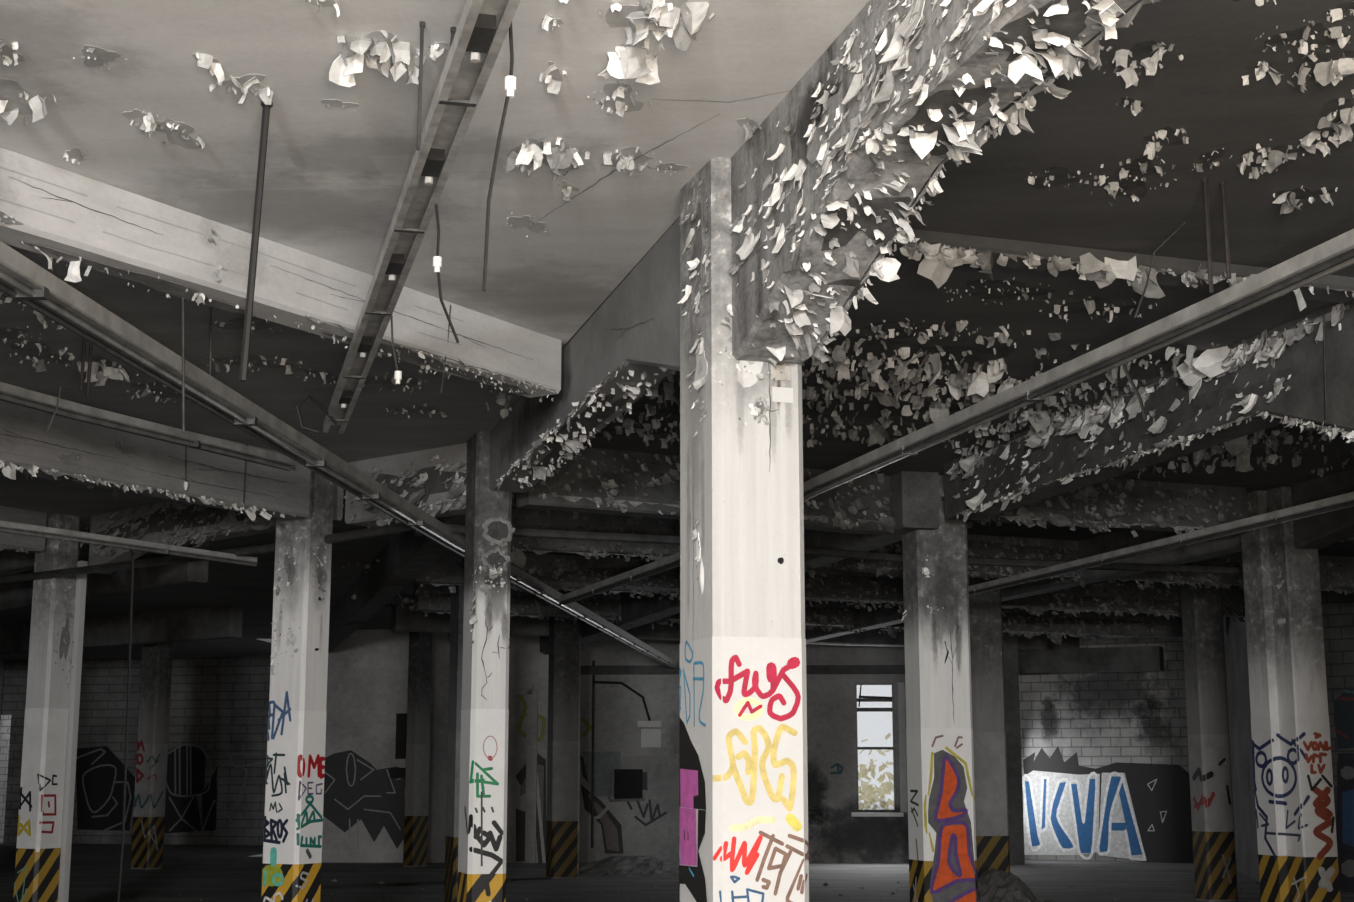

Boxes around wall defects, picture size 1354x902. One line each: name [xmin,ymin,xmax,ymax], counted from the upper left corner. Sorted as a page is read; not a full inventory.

peeling [305,0,340,17]
peeling [0,39,56,125]
peeling [73,45,127,70]
peeling [320,30,448,112]
peeling [63,148,87,164]
peeling [121,109,213,149]
peeling [1273,186,1338,215]
peeling [295,315,355,348]
peeling [363,0,1257,643]
peeling [942,286,1354,645]
peeling [0,459,296,557]
peeling [270,533,328,667]